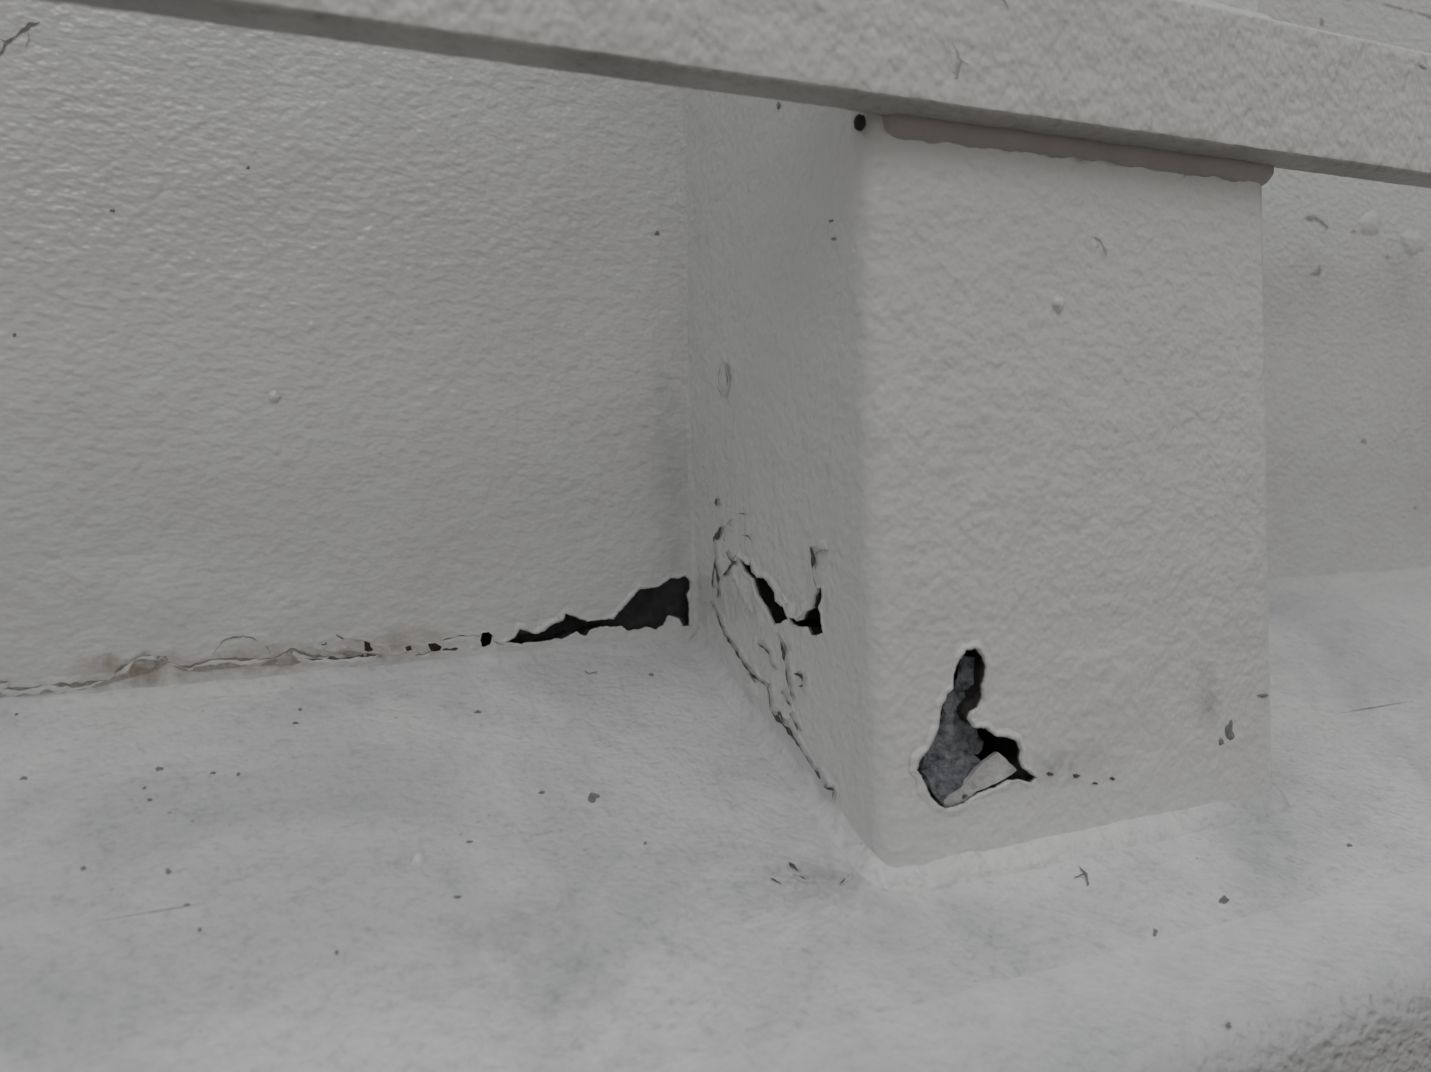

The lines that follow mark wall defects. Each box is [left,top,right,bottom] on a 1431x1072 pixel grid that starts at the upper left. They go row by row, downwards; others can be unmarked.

peeling [0,636,329,716]
spalling [479,572,694,650]
crack [710,498,839,801]
peeling [736,551,825,640]
peeling [909,640,1054,817]